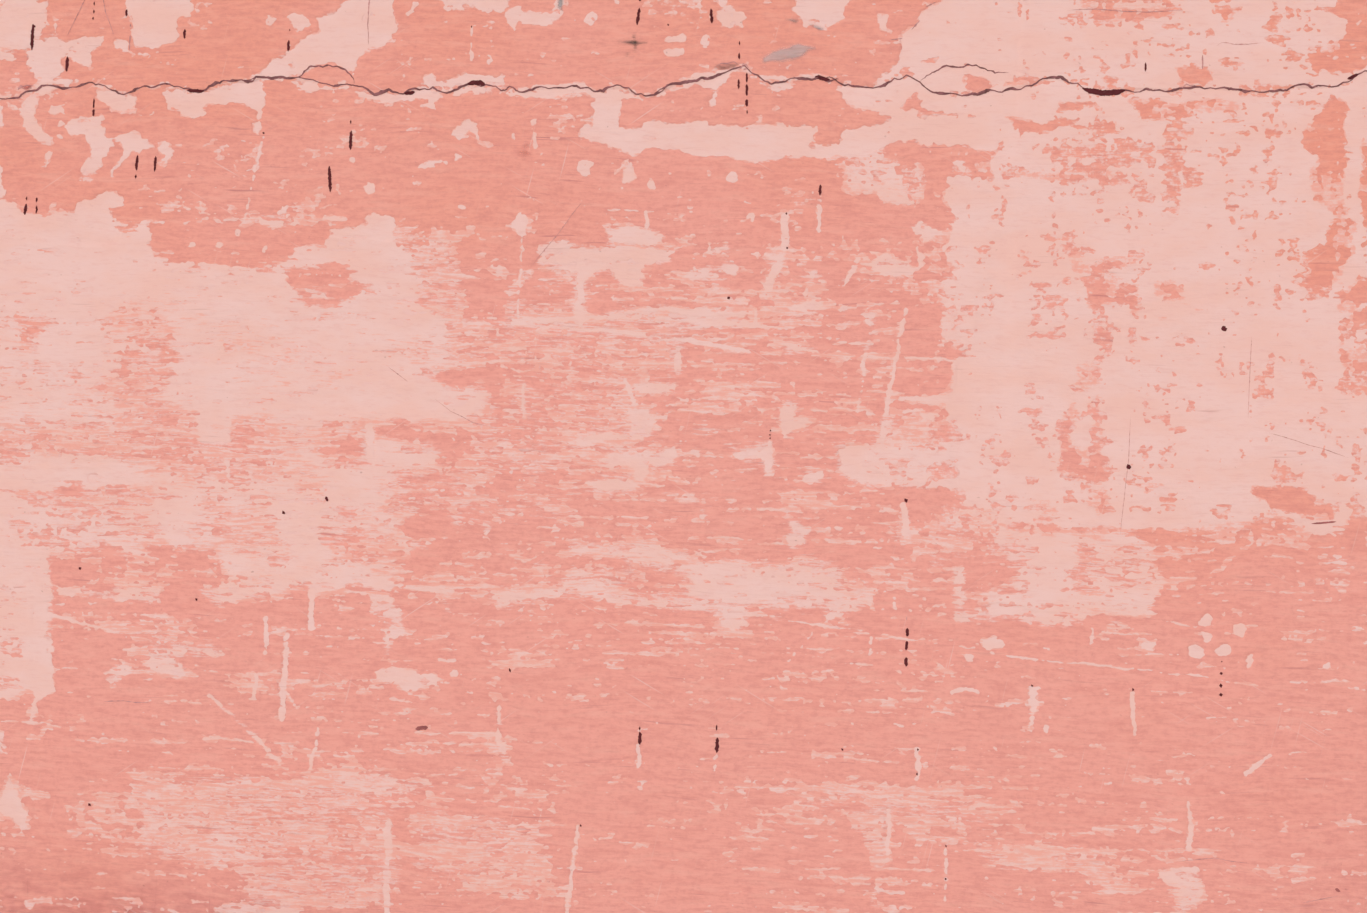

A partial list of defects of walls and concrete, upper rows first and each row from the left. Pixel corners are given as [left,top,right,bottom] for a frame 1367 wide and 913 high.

peeling [114,0,212,65]
peeling [441,0,569,36]
peeling [574,11,598,26]
crack [0,61,1367,99]
peeling [273,120,387,192]
peeling [412,119,494,186]
peeling [577,160,601,190]